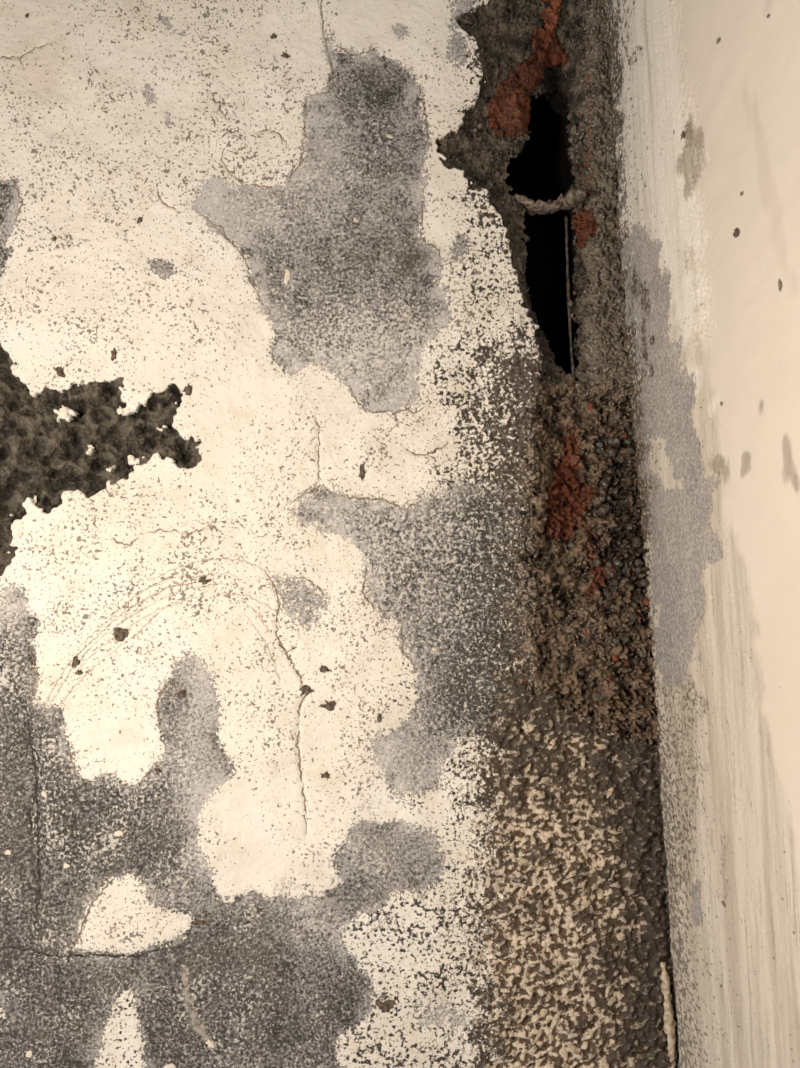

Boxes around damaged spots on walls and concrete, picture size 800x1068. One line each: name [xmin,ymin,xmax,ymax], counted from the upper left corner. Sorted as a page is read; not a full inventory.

peeling [157,15,189,35]
peeling [141,82,158,105]
peeling [0,173,24,288]
peeling [147,258,178,279]
peeling [182,0,662,804]
peeling [0,343,450,1068]
crack [264,569,307,826]
peeling [484,887,511,913]
peeling [410,999,473,1040]